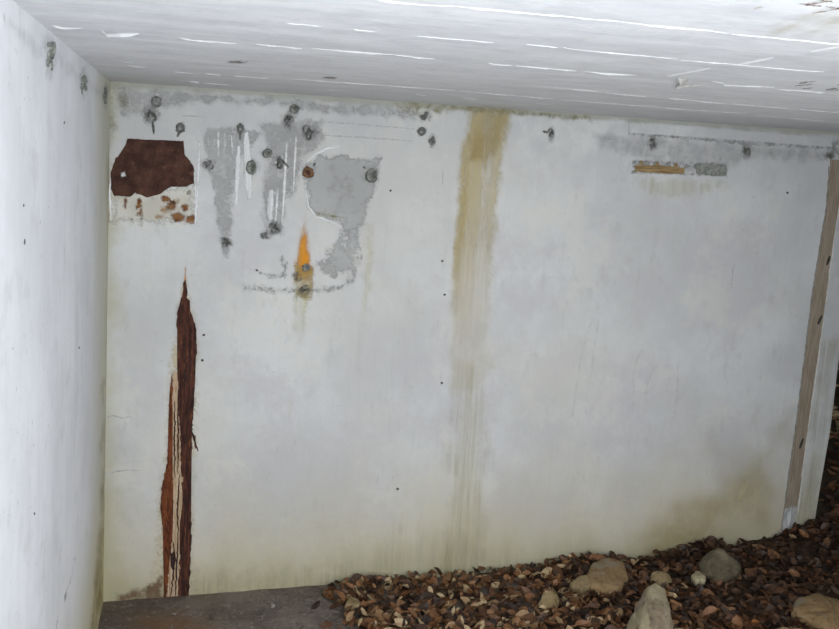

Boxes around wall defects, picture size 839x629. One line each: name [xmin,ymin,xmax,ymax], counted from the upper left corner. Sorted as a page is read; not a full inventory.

peeling [379,0,723,33]
peeling [733,34,839,45]
water stain [462,111,508,227]
peeling [112,186,195,225]
peeling [205,121,382,292]
rust [295,234,313,286]